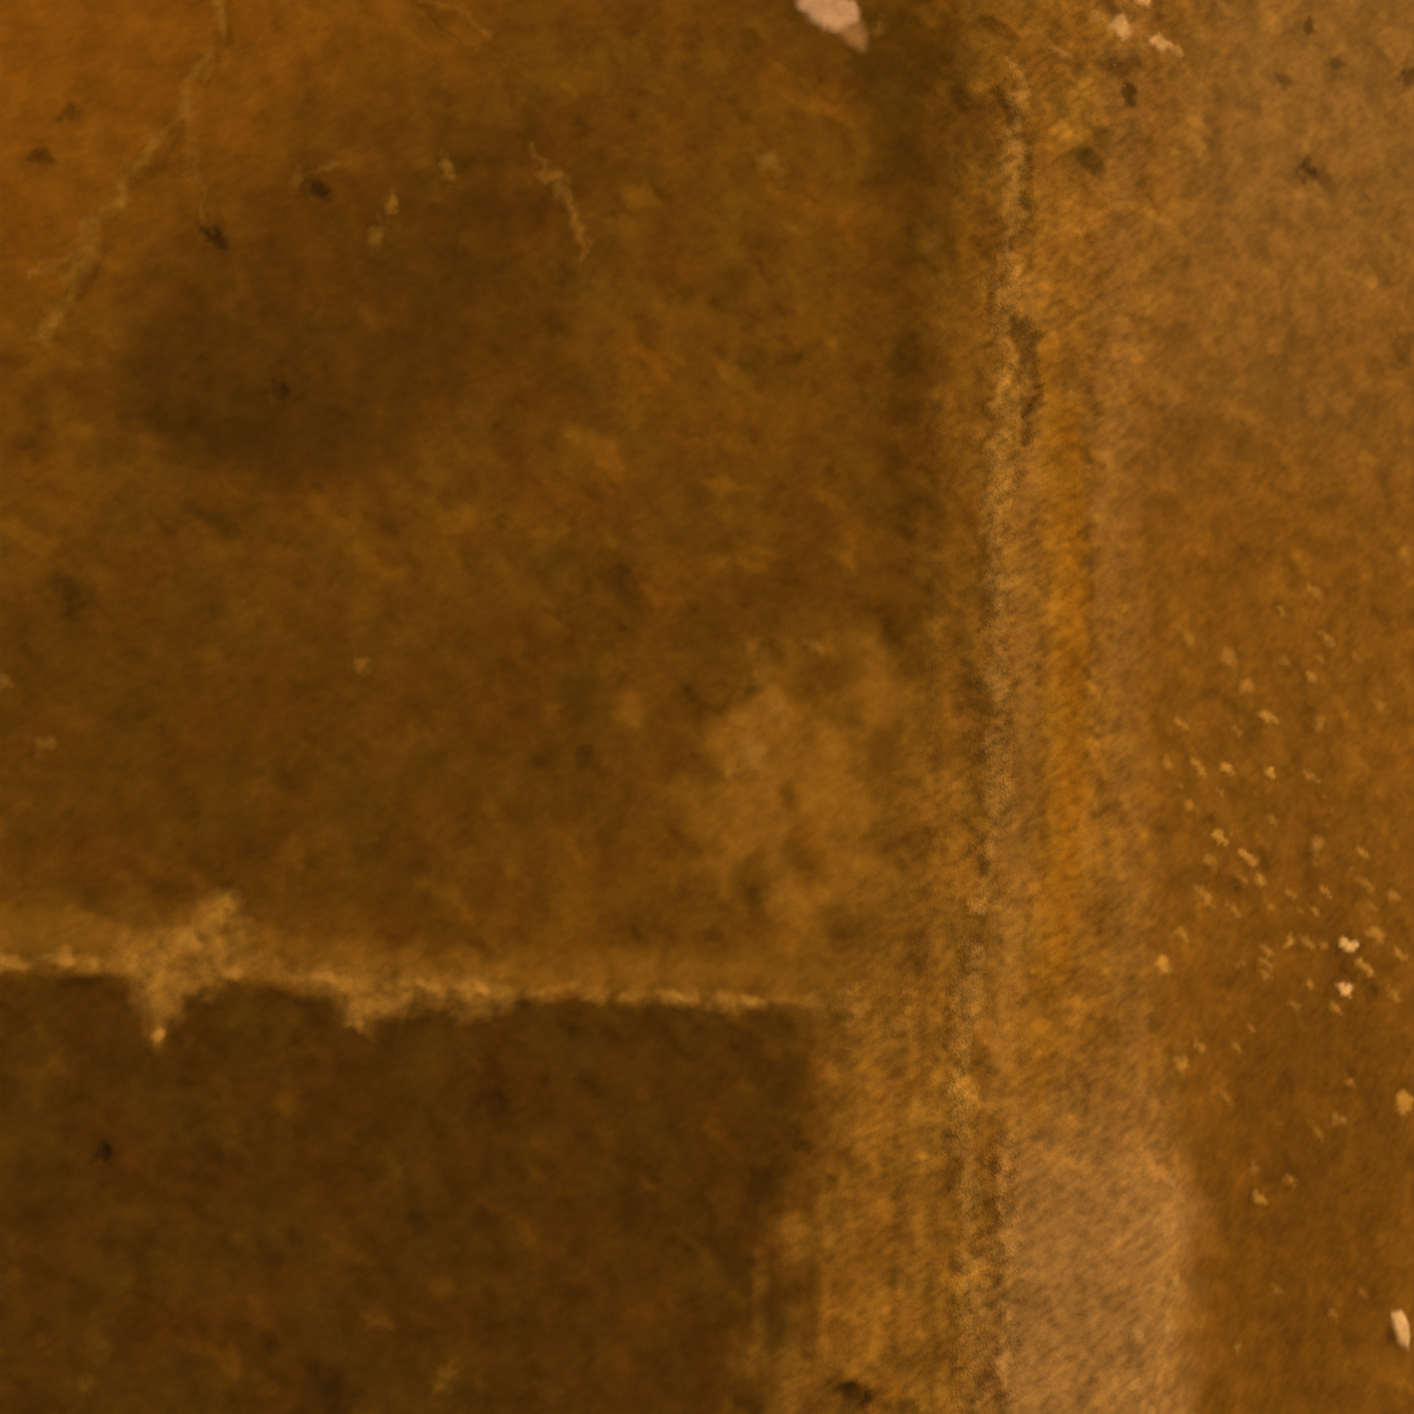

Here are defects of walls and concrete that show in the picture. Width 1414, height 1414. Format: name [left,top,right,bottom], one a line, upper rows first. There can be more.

spalling [792,0,891,57]
damp [0,52,747,948]